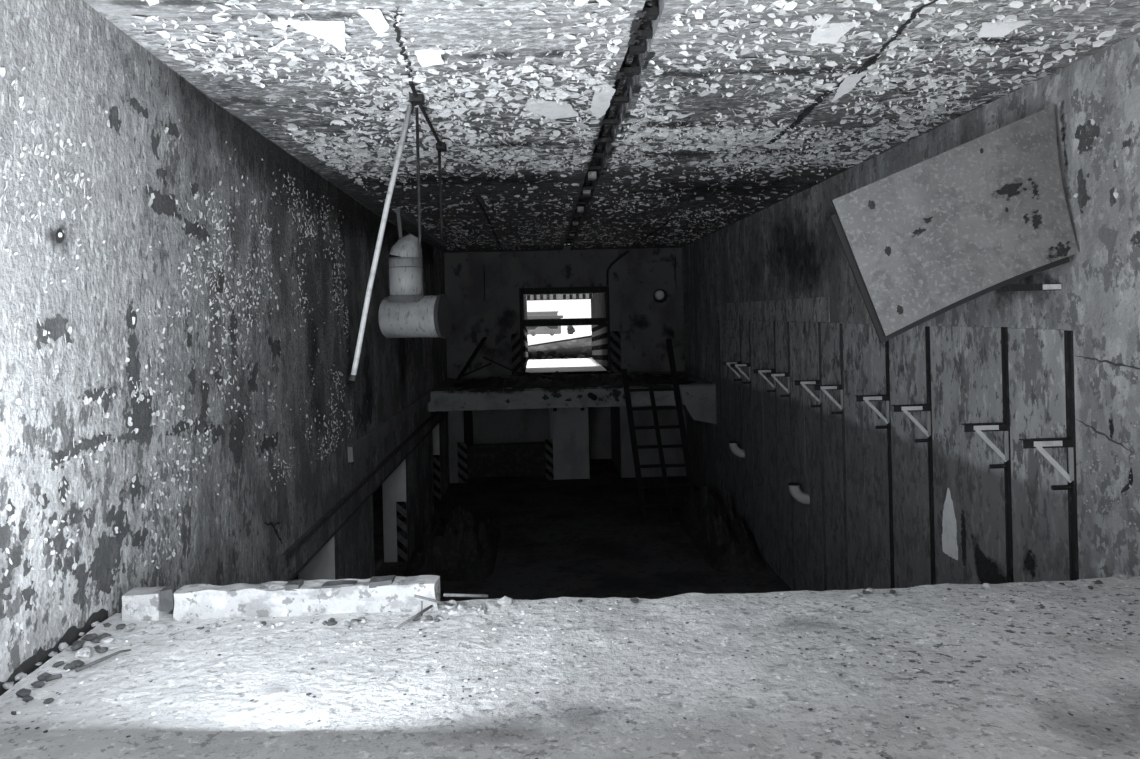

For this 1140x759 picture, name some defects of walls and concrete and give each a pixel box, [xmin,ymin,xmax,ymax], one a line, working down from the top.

peeling [109,98,210,242]
peeling [131,0,1116,251]
crack [767,0,938,144]
peeling [1110,187,1118,207]
peeling [0,297,245,696]
peeling [215,267,238,355]
peeling [247,361,259,393]
peeling [258,432,280,458]